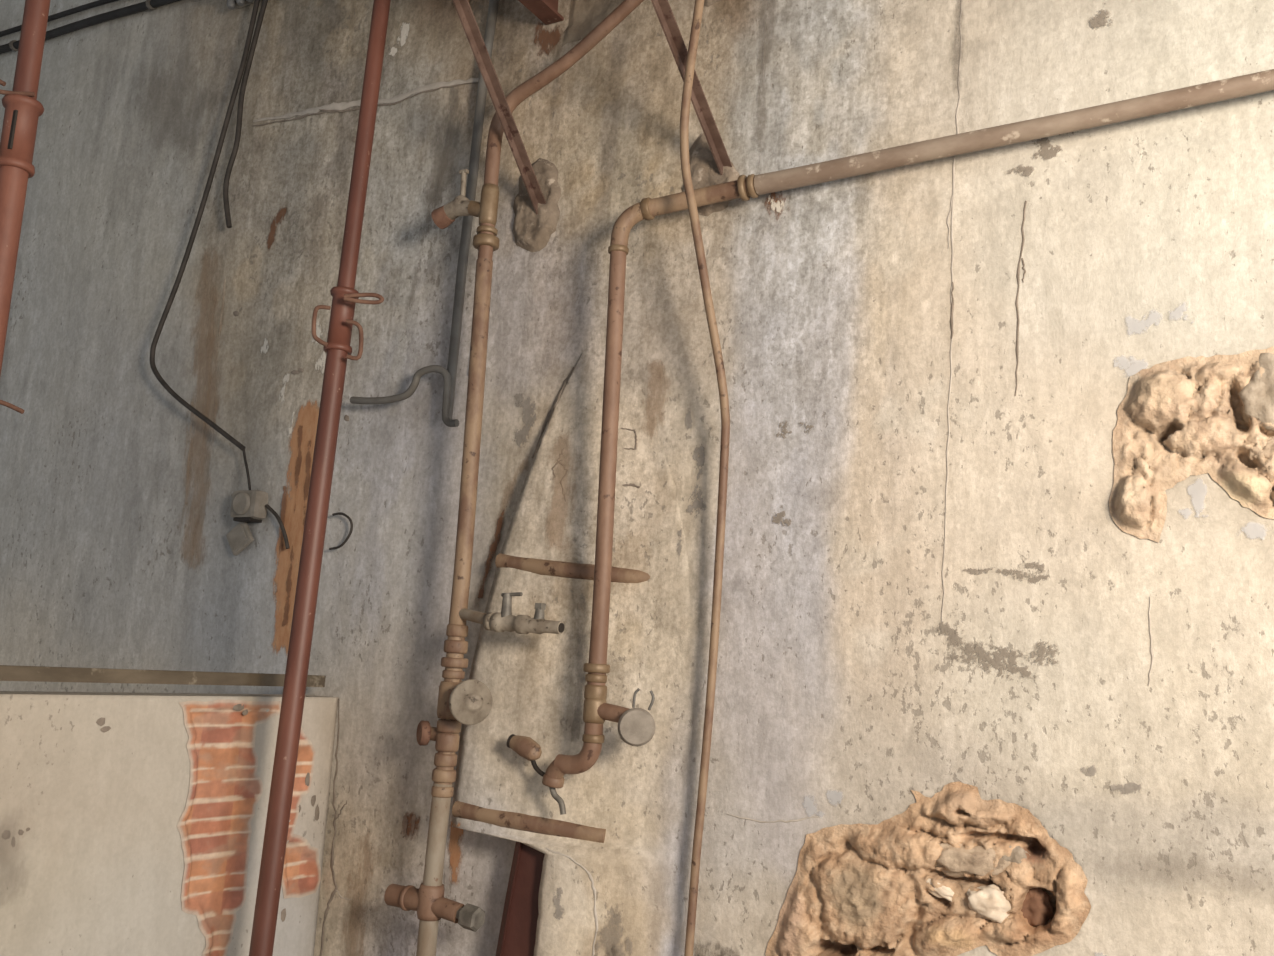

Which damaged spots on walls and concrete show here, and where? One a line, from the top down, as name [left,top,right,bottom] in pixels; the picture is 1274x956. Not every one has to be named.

crack [253,78,479,126]
crack [1015,201,1027,396]
flaking render [1109,346,1274,543]
flaking render [177,699,281,956]
flaking render [765,781,1091,956]